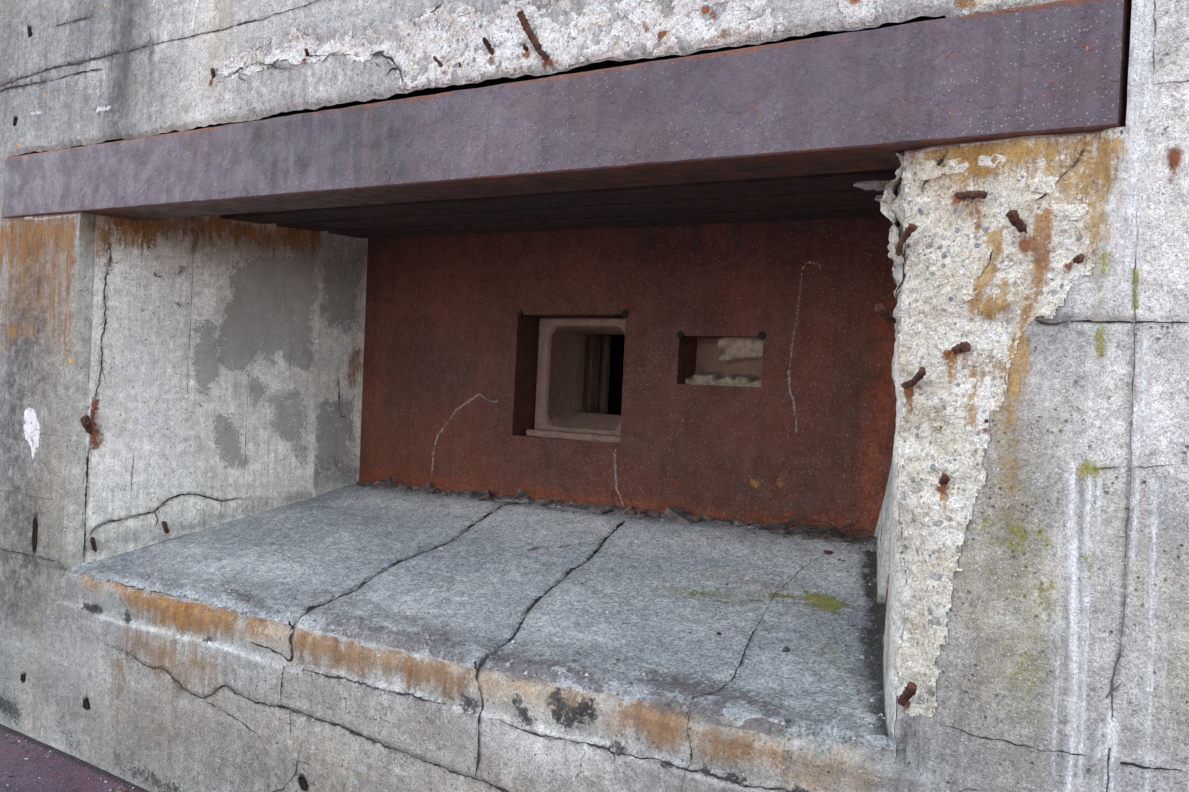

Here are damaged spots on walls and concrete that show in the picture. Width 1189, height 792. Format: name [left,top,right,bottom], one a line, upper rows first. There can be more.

spalling [214,0,796,90]
spalling [835,0,884,28]
spalling [952,0,1061,16]
corrosion [0,215,75,349]
crack [93,227,118,405]
corrosion [913,134,1125,492]
spalling [880,130,1117,718]
crack [1036,196,1189,717]
corrosion [114,583,268,699]
corrosion [293,630,471,697]
crack [84,502,822,792]
crack [944,725,1182,792]